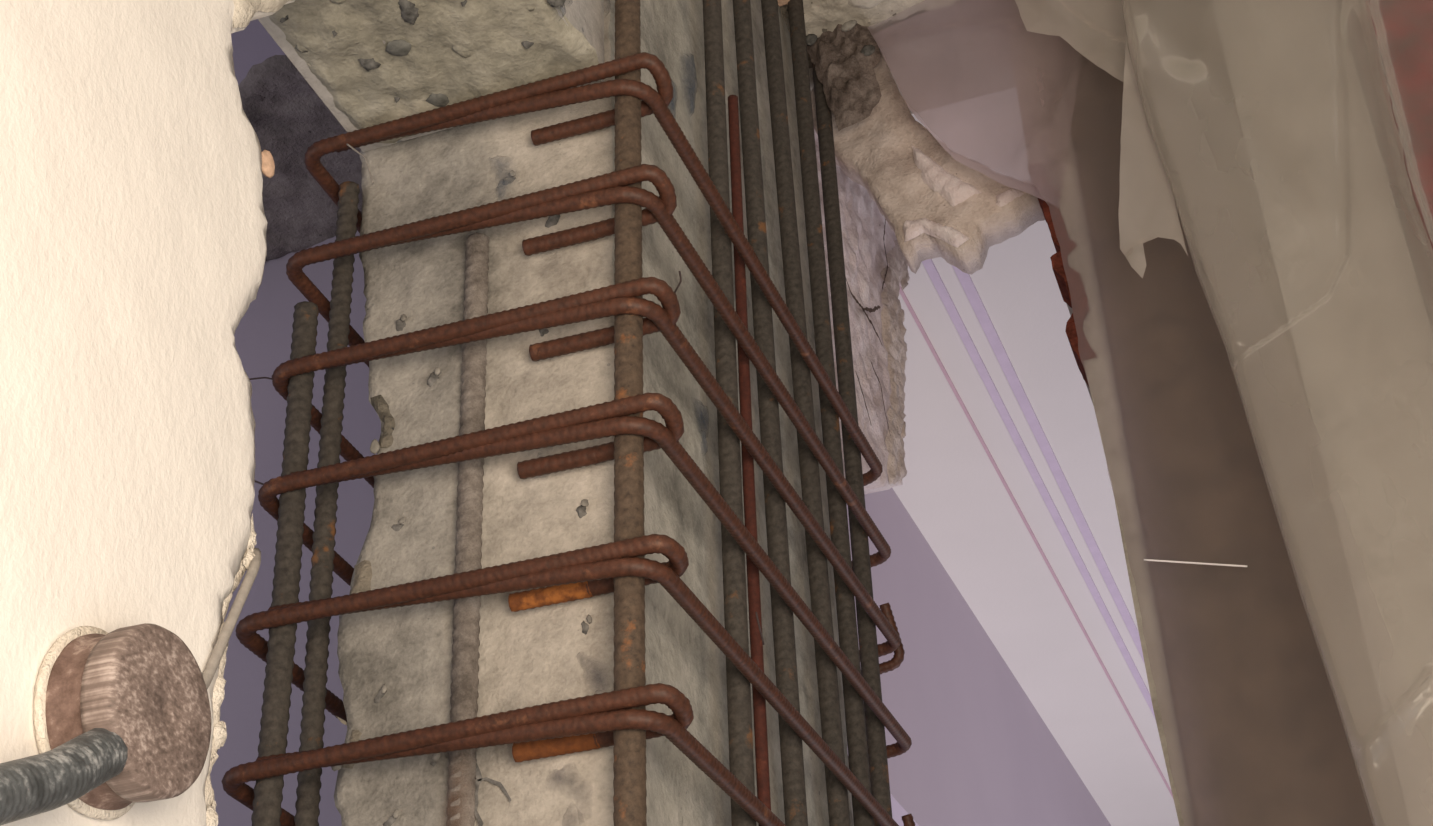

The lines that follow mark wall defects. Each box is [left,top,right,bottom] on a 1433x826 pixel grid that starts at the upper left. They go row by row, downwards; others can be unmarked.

spalling [232,0,645,607]
spalling [703,0,1098,826]
spalling [258,617,362,757]
spalling [450,596,481,722]
spalling [581,614,592,635]
spalling [613,576,646,691]
spalling [251,764,354,826]
spalling [430,748,477,826]
spalling [613,729,647,826]